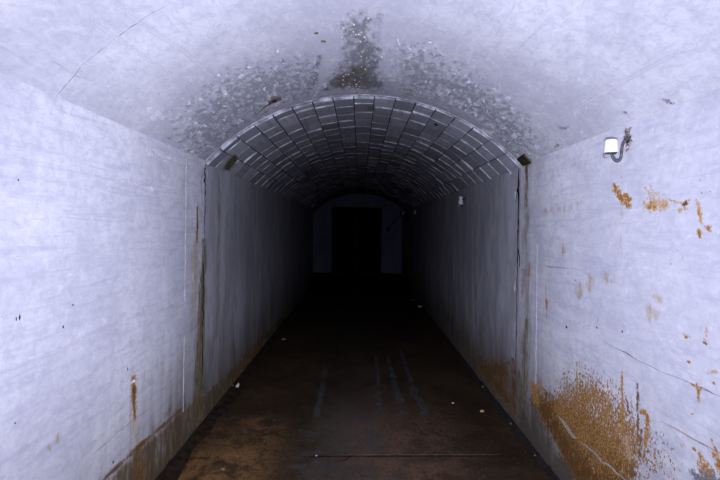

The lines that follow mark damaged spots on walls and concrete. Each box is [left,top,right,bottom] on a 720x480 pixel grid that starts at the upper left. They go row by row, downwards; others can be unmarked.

crack [59,5,168,93]
peeling [147,49,300,157]
damp [324,15,384,93]
peeling [389,39,549,157]
corrosion [612,183,632,209]
corrosion [643,184,712,238]
damp [103,317,284,480]
corrosion [446,313,684,480]
crack [600,339,719,396]